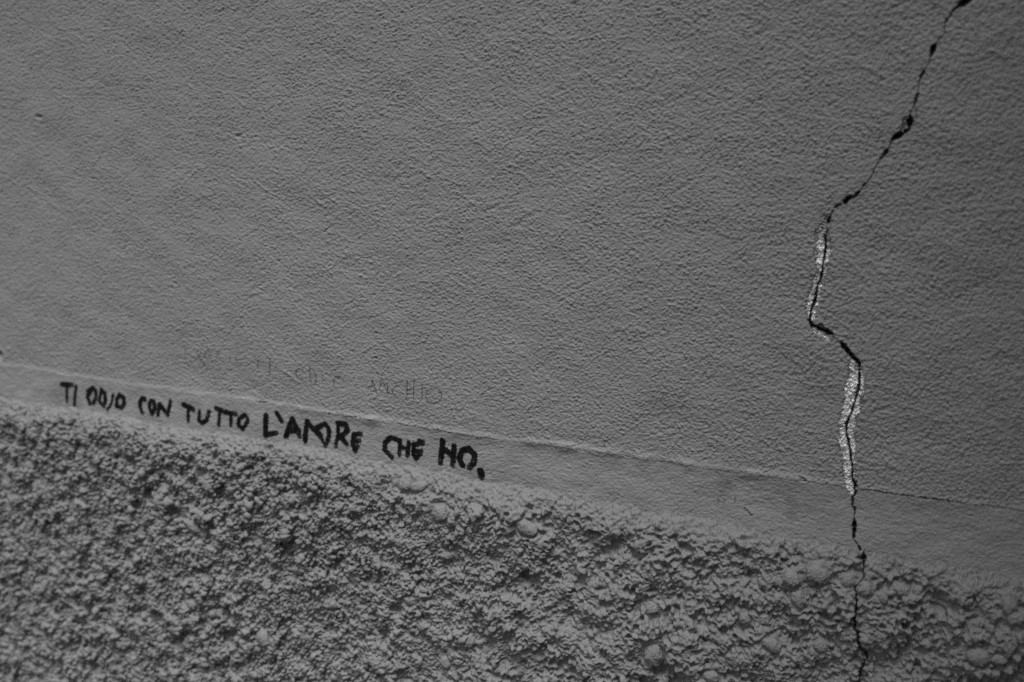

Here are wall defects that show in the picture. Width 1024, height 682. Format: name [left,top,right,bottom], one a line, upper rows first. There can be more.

crack [615,0,1022,682]